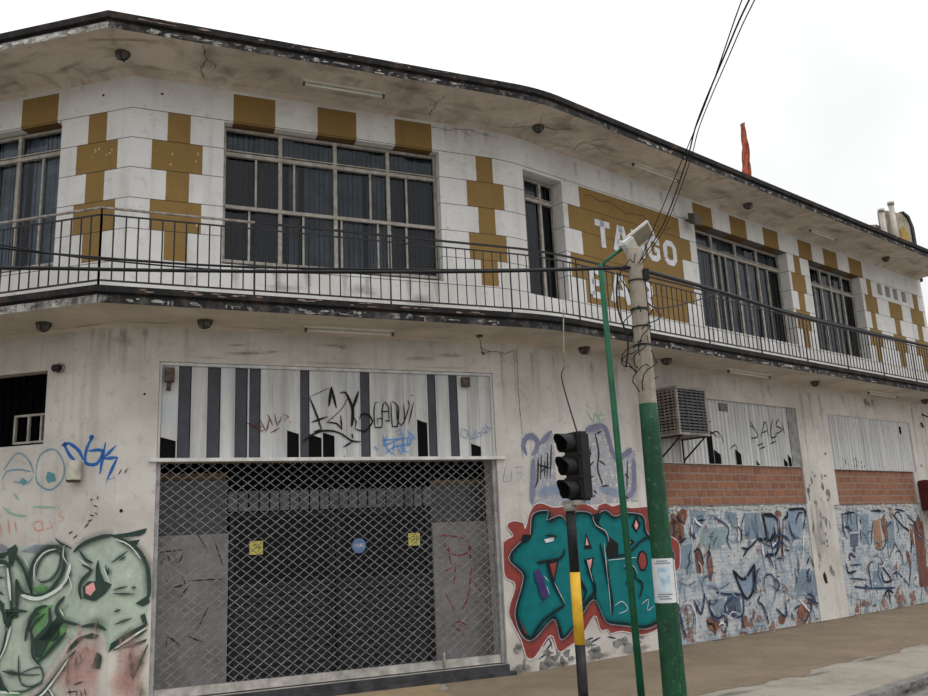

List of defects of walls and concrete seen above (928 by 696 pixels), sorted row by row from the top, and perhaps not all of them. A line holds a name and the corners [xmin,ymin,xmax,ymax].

peeling [138,18,223,44]
peeling [279,44,359,67]
peeling [375,61,478,89]
peeling [184,291,244,310]
peeling [297,299,374,317]